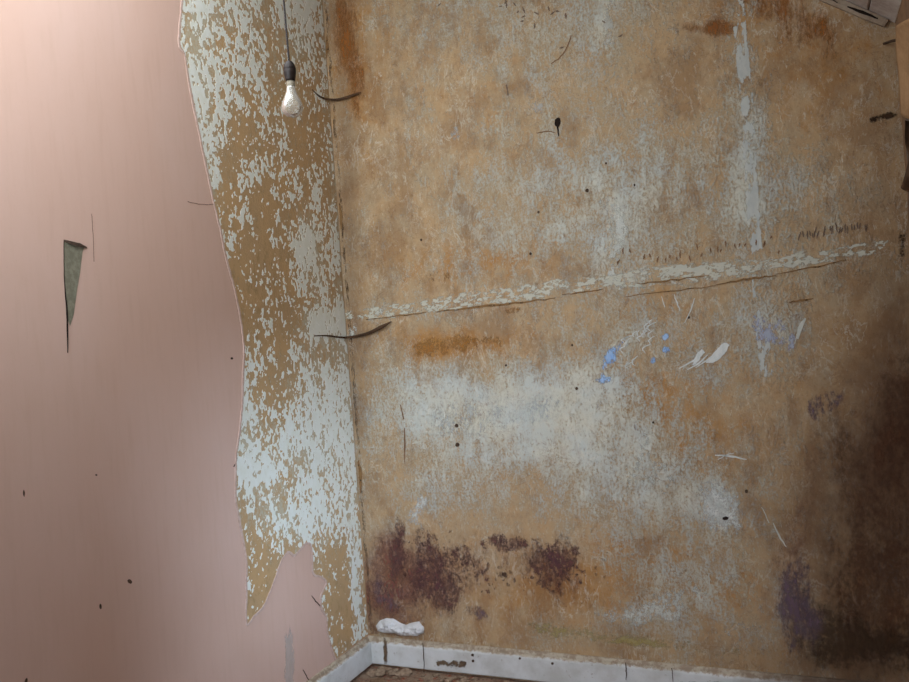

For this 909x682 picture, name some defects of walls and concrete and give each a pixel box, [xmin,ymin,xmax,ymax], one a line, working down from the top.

corrosion [336,0,364,112]
corrosion [705,19,733,36]
peeling [178,0,414,661]
water stain [777,497,909,663]